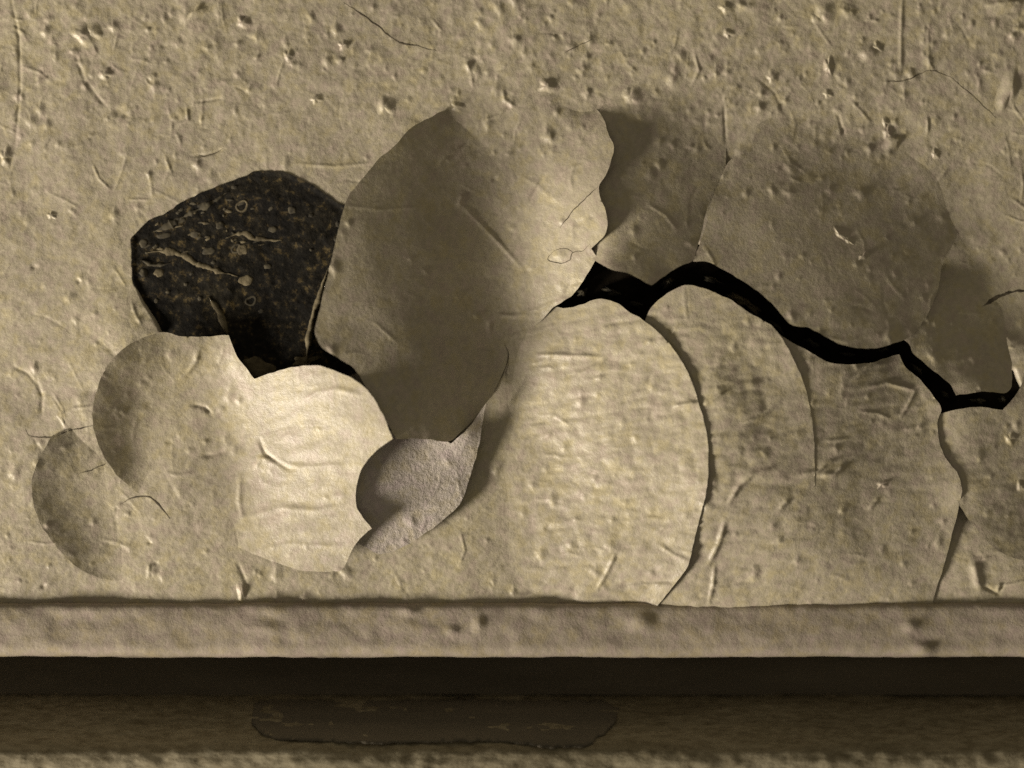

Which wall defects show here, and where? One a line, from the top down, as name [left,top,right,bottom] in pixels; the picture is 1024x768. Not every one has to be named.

peeling [31,88,1024,608]
crack [547,190,1024,413]